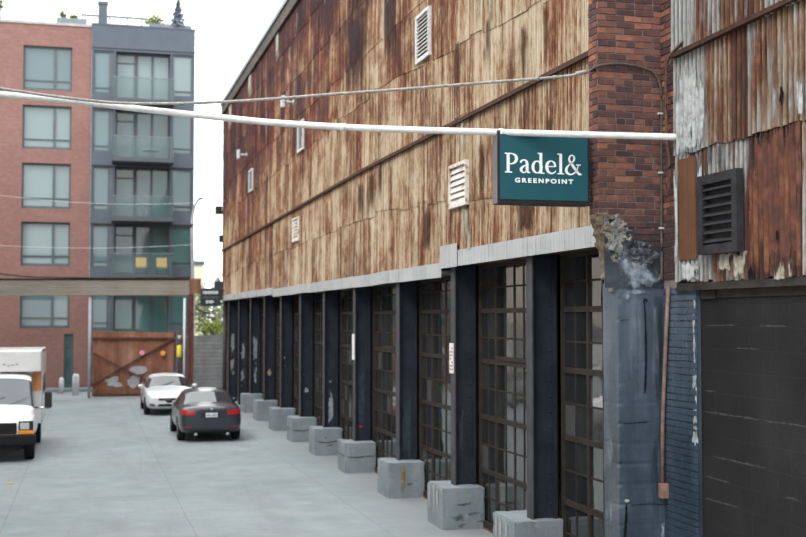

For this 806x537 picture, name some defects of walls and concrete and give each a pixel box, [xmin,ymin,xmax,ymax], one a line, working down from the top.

corrosion [348,0,364,85]
corrosion [384,0,395,53]
corrosion [751,35,766,114]
corrosion [358,164,381,212]
corrosion [519,206,530,230]
corrosion [747,121,804,273]
spalling [590,212,660,292]
peeling [717,251,745,277]
peeling [774,264,791,280]
crack [620,298,648,394]
crack [623,499,665,537]